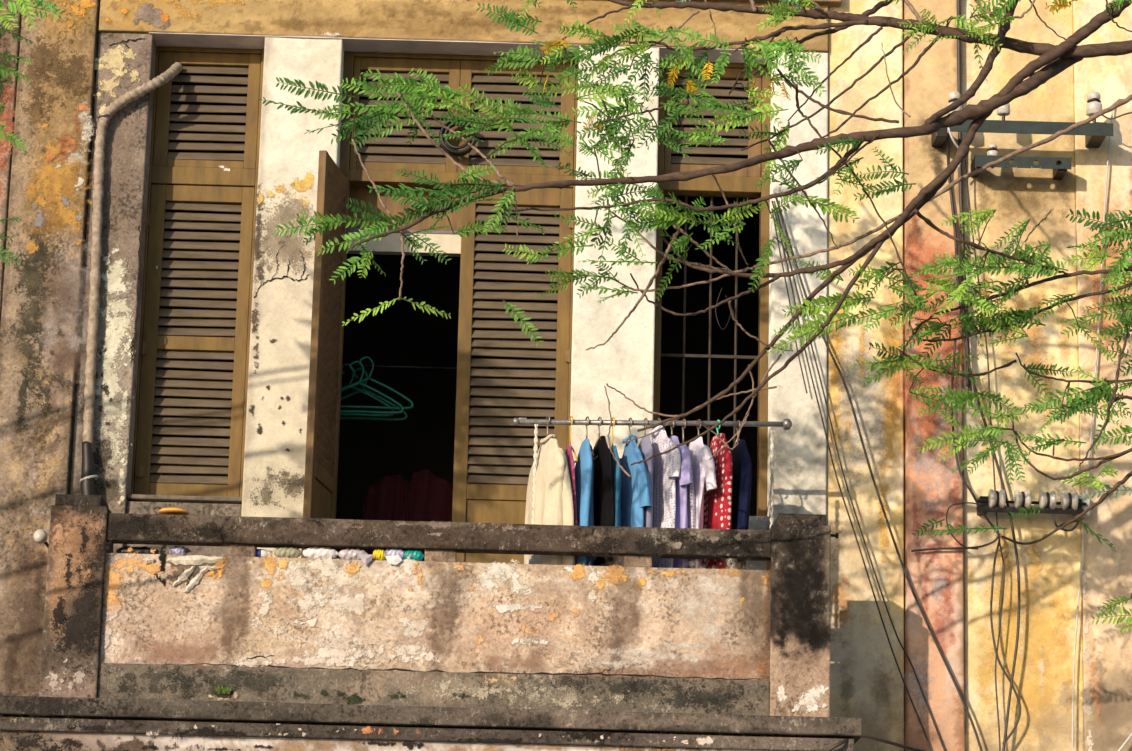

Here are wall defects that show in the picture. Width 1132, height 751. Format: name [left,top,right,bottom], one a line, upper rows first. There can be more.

peeling [0,0,140,254]
crack [253,245,309,298]
peeling [93,248,134,504]
damp [94,434,237,544]
damp [5,522,89,687]
damp [0,556,299,751]
peeling [103,545,228,649]
peeling [251,554,379,634]
peeling [223,617,444,667]
peeling [450,559,583,646]
spalling [66,724,306,751]
damp [448,729,637,751]